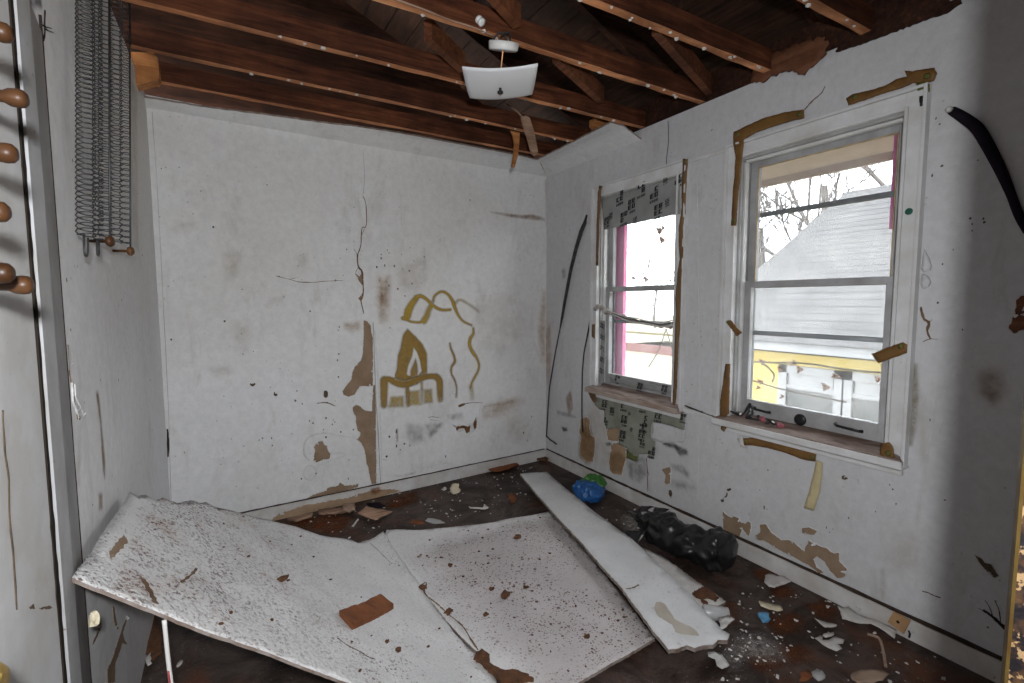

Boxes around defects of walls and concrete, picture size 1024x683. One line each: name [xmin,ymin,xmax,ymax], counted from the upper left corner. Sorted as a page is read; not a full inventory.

crack [277,197,367,314]
crack [920,307,938,342]
peeling [1008,295,1024,334]
peeling [305,320,378,499]
peeling [579,416,627,476]
peeling [721,488,848,579]
peeling [974,554,1000,578]